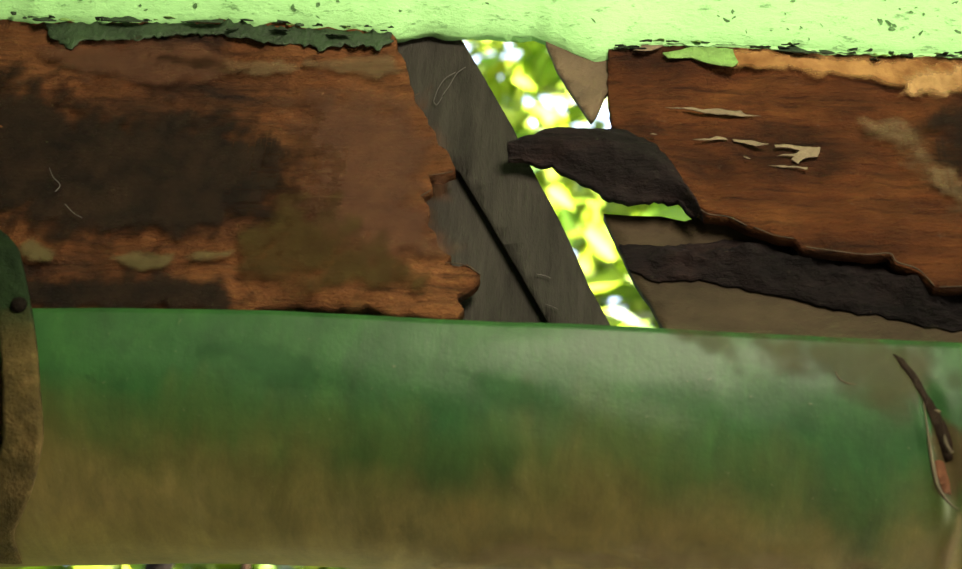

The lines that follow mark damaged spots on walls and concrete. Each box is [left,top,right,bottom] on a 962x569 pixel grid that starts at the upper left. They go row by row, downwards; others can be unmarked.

peeling [10,3,394,52]
peeling [612,26,962,67]
peeling [665,107,758,117]
peeling [692,136,821,170]
crack [893,354,962,509]